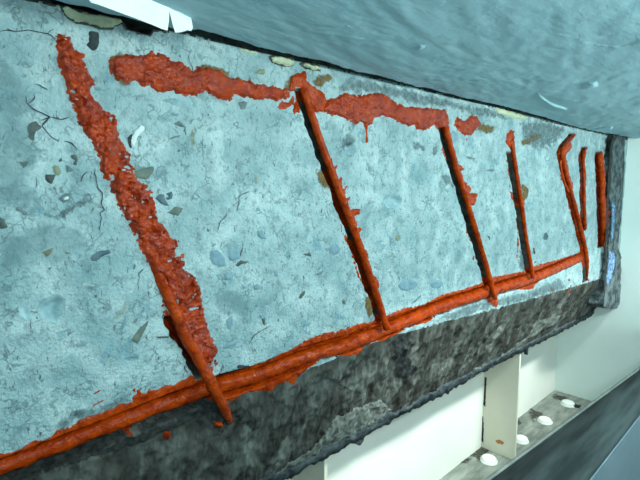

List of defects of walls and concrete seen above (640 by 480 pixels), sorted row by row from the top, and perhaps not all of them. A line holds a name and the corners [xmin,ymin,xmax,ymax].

flaking render [47,0,193,37]
peeling [269,55,294,67]
peeling [300,62,321,71]
rust [314,74,332,86]
spalling [594,151,609,248]
spalling [0,33,233,475]
spalling [215,71,589,402]
spalling [261,311,595,480]
rust [198,397,230,432]
rust [461,447,488,463]